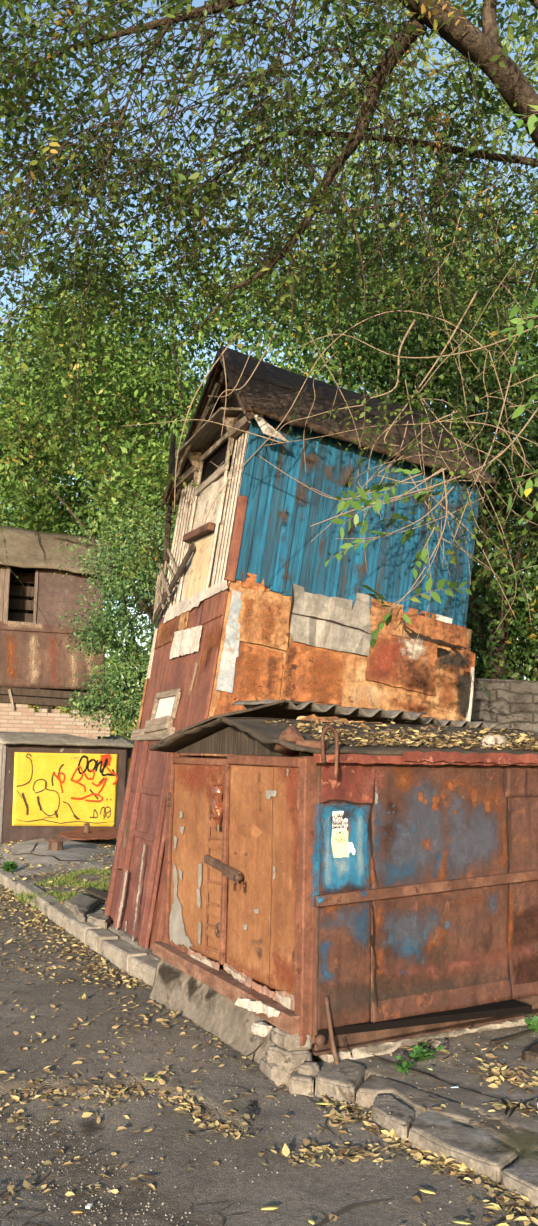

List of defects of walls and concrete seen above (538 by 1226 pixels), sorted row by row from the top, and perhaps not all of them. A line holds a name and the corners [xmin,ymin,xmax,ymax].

corrosion [372,643,454,706]
corrosion [390,699,424,711]
peeling [312,766,498,942]
peeling [169,863,246,983]
corrosion [324,883,366,913]
peeling [380,909,534,974]
corrosion [508,894,538,985]
spalling [159,964,216,1007]
crack [0,1170,52,1226]
crack [185,1199,249,1226]
crack [308,1199,392,1226]